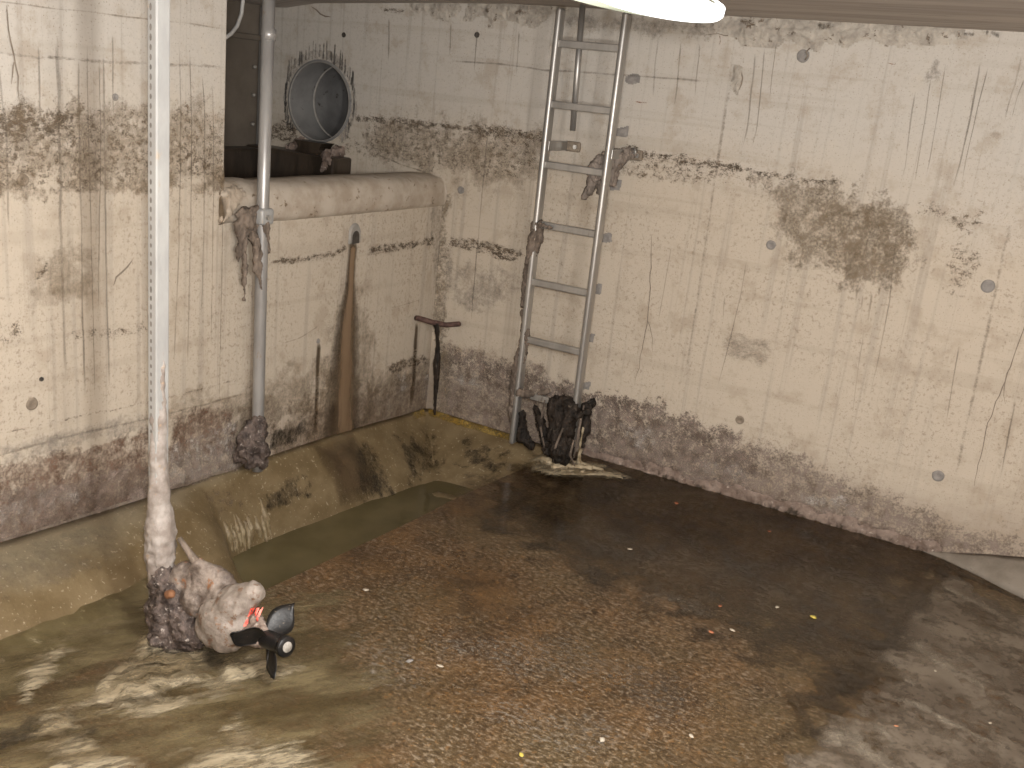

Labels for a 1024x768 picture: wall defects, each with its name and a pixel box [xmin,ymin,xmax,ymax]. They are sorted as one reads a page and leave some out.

damp [0,99,148,191]
damp [169,96,224,184]
damp [341,104,543,177]
damp [623,147,914,287]
damp [143,353,251,582]
damp [267,196,1024,736]
crack [974,329,1024,485]